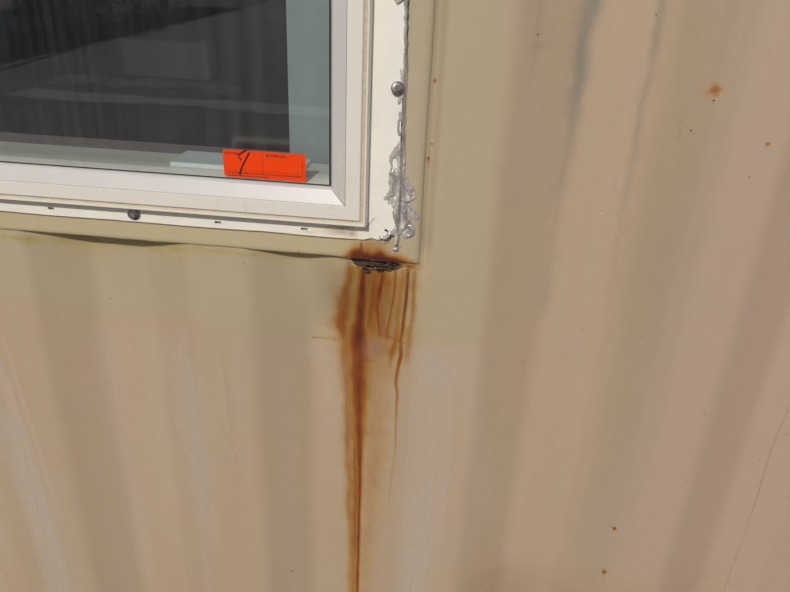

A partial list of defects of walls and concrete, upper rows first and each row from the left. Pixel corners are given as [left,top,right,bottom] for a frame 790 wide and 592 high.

damp [565,0,602,151]
corrosion [333,242,417,592]